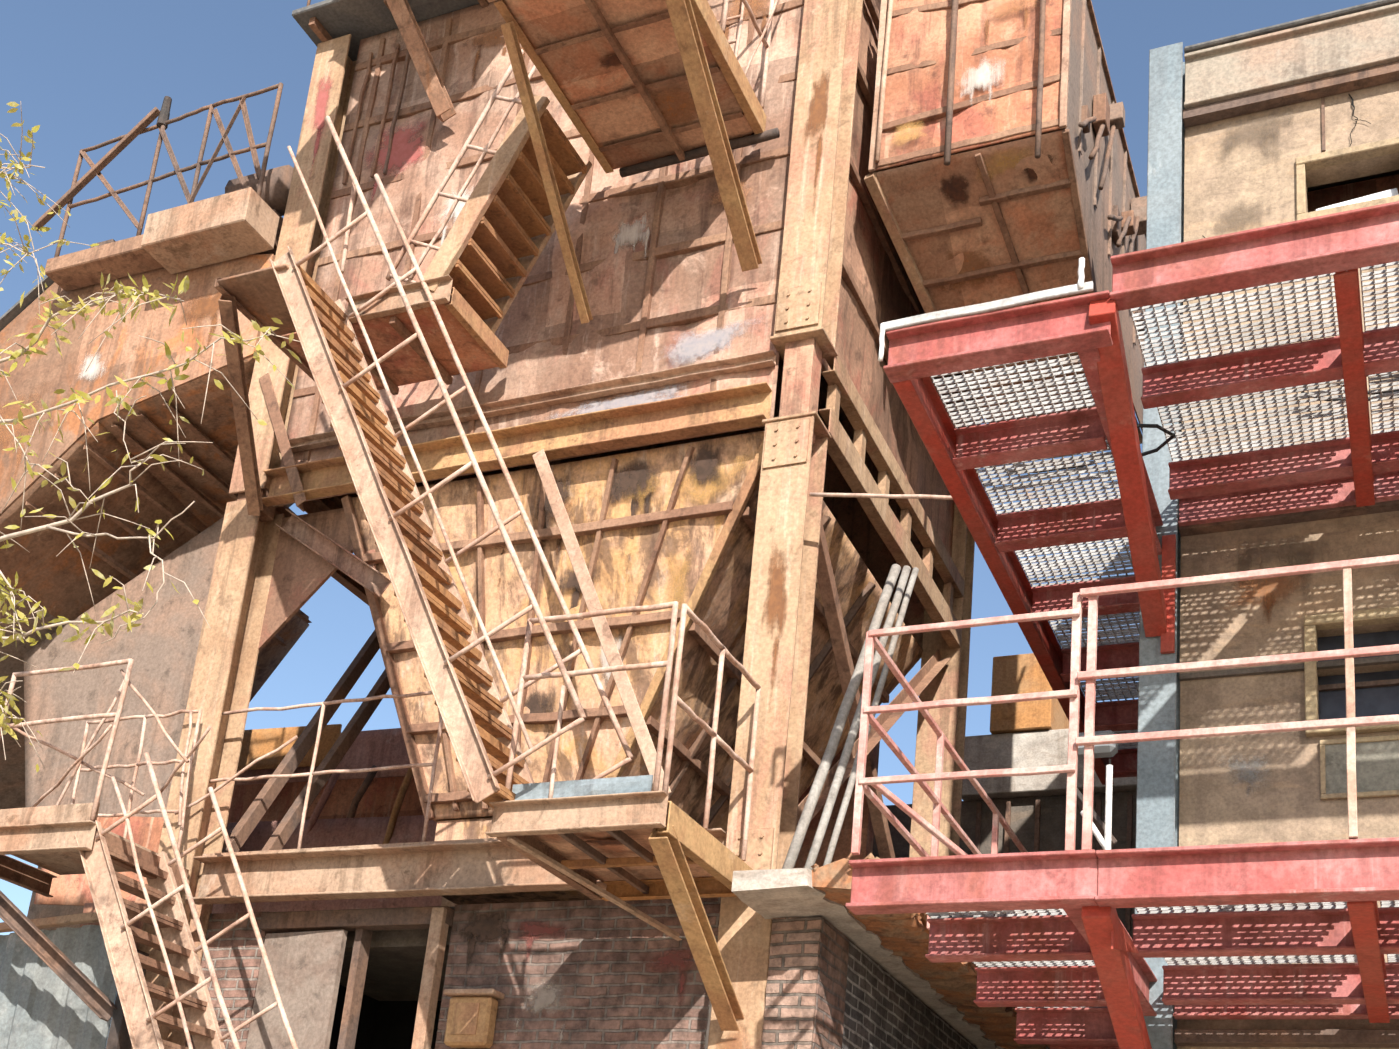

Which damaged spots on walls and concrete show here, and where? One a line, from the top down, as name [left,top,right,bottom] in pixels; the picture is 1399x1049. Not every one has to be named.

crack [1348,94,1371,145]
peeling [669,323,742,363]
damp [610,461,660,516]
damp [690,443,718,484]